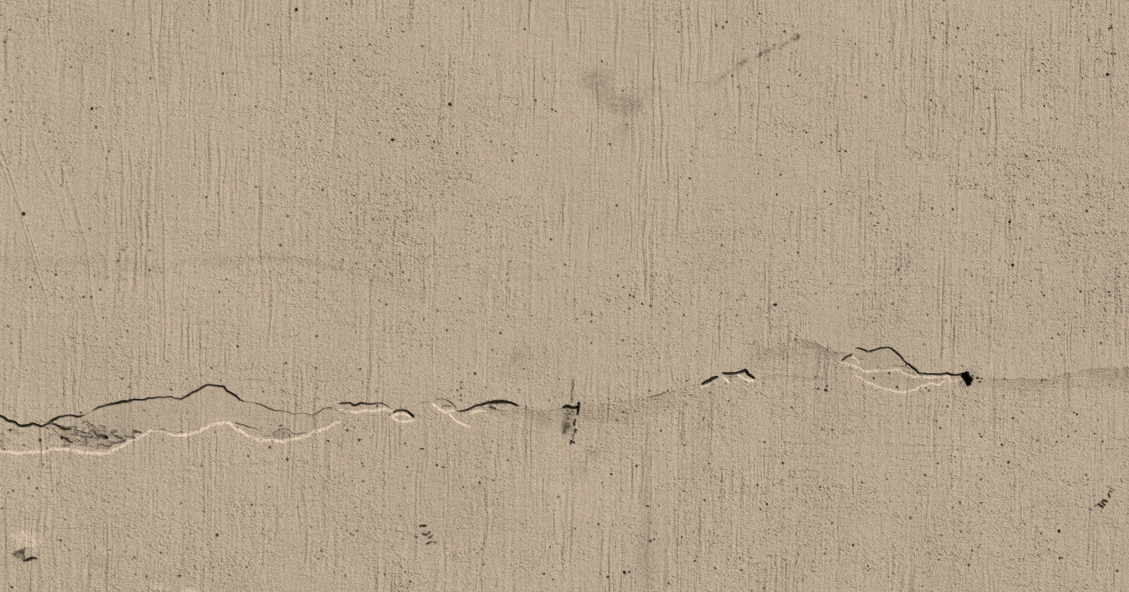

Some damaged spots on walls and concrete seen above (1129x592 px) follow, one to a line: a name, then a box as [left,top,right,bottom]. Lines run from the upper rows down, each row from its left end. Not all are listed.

crack [700,368,828,389]
crack [454,399,563,415]